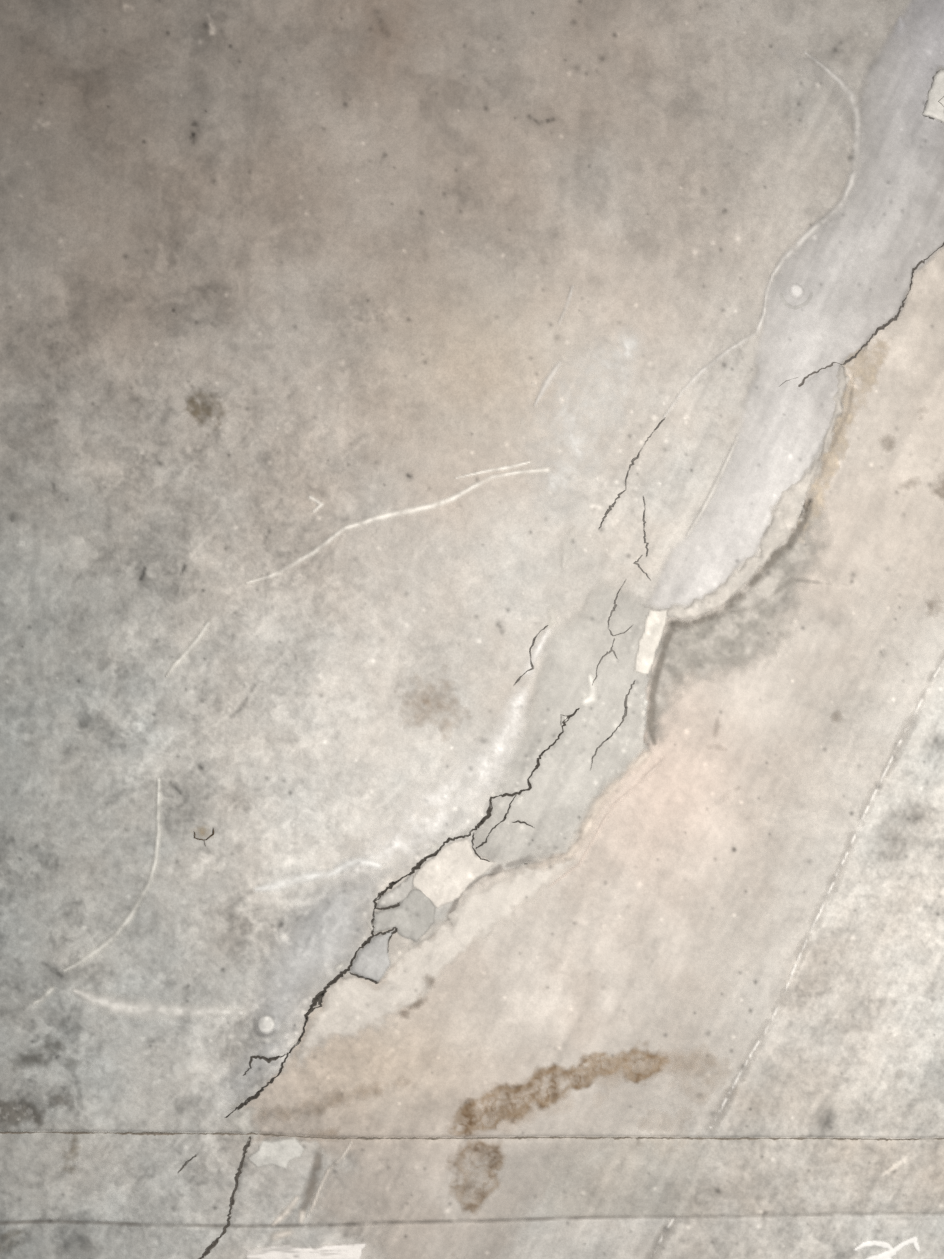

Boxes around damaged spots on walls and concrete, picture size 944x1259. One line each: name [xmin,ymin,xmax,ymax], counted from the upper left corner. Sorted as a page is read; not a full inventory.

crack [780,244,944,387]
crack [199,417,666,1259]
spalling [232,246,944,1259]